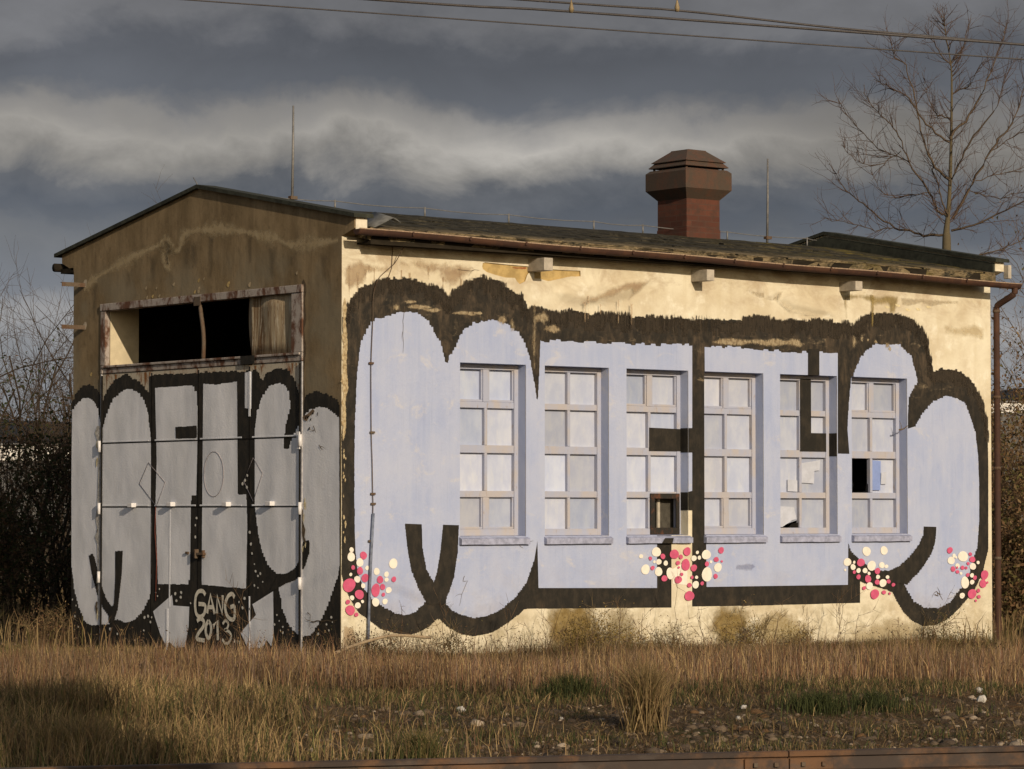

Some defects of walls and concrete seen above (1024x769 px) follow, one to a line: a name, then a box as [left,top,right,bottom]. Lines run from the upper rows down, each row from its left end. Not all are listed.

damp [83,222,338,291]
damp [346,263,375,285]
damp [401,265,465,286]
flaking render [482,262,581,284]